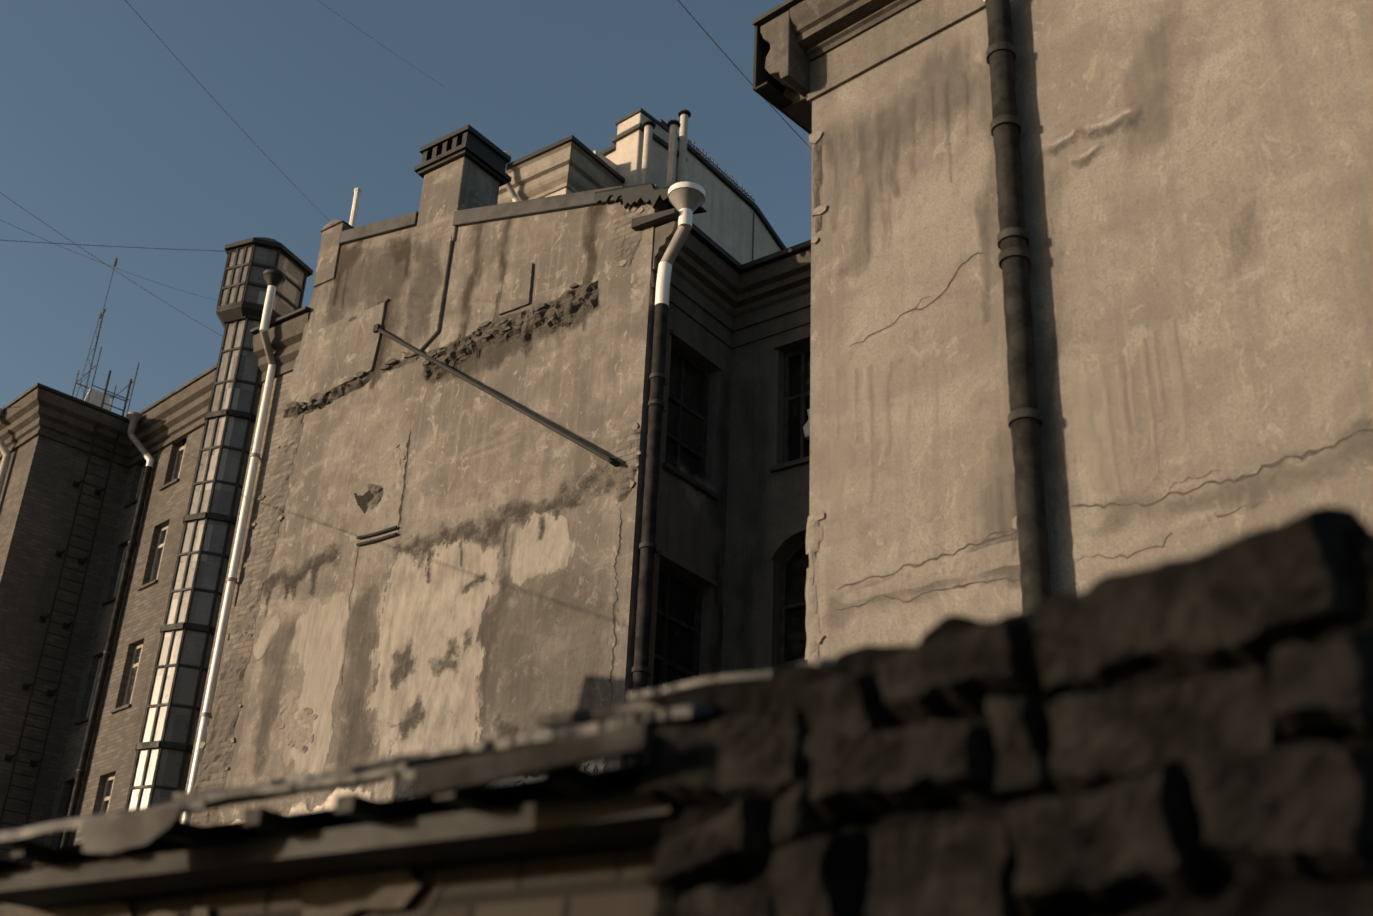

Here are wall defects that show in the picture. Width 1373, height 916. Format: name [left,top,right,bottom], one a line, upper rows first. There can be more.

crack [850,252,988,346]
flaking render [193,281,599,791]
crack [832,529,1020,610]
crack [1065,421,1373,562]
flaking render [189,808,219,826]
flaking render [374,778,414,802]